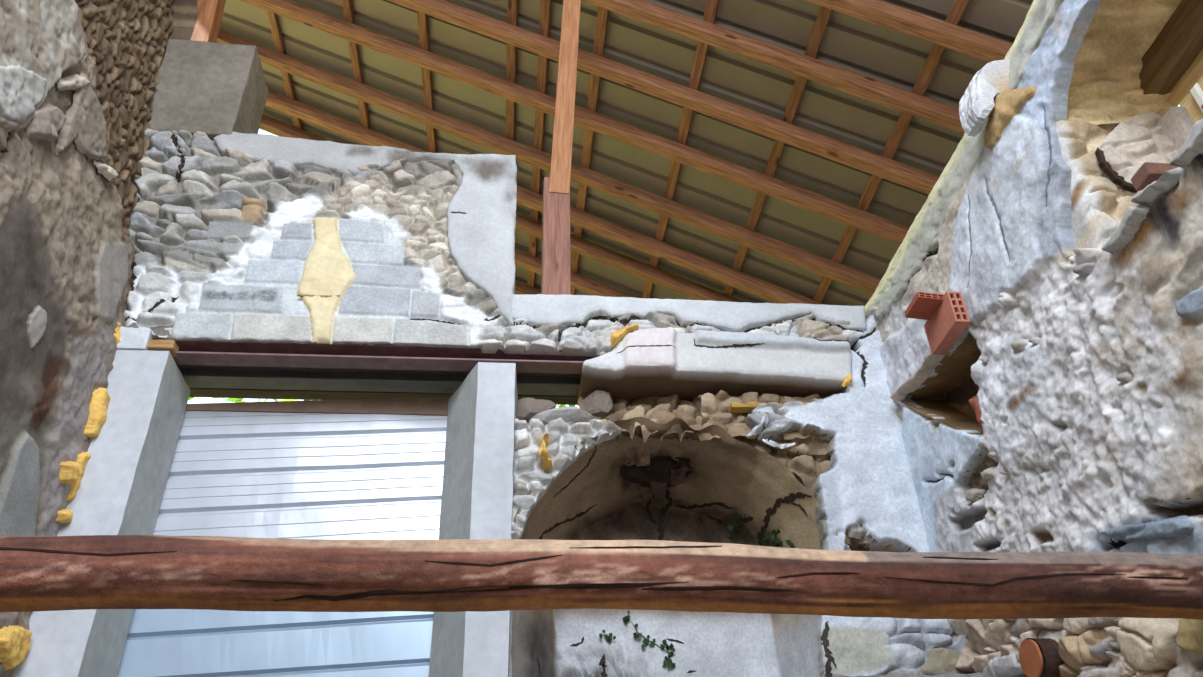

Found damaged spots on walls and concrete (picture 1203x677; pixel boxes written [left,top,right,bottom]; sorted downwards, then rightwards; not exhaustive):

damp [1191,154,1203,173]
damp [1147,196,1178,241]
crack [409,314,877,387]
spalling [746,407,834,459]
crack [539,441,597,539]
spalling [619,446,693,501]
damp [574,462,772,544]
crack [647,489,812,546]